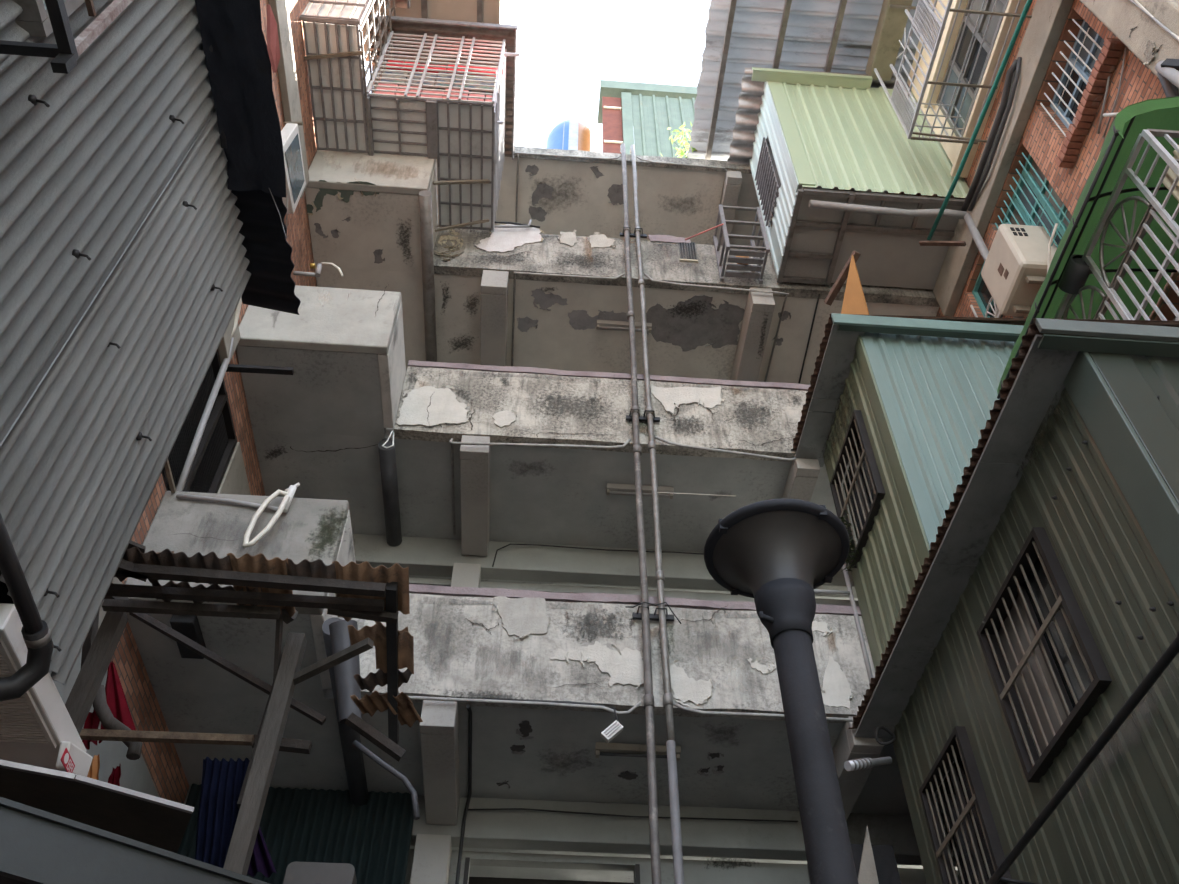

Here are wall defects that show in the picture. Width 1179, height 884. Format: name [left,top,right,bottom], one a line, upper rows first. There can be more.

spalling [435,164,554,261]
peeling [558,229,616,248]
peeling [650,384,725,415]
leakage [310,509,352,557]
peeling [493,596,551,639]
spalling [550,641,644,688]
spalling [669,659,714,706]
spalling [746,657,775,674]
peeling [821,656,854,709]